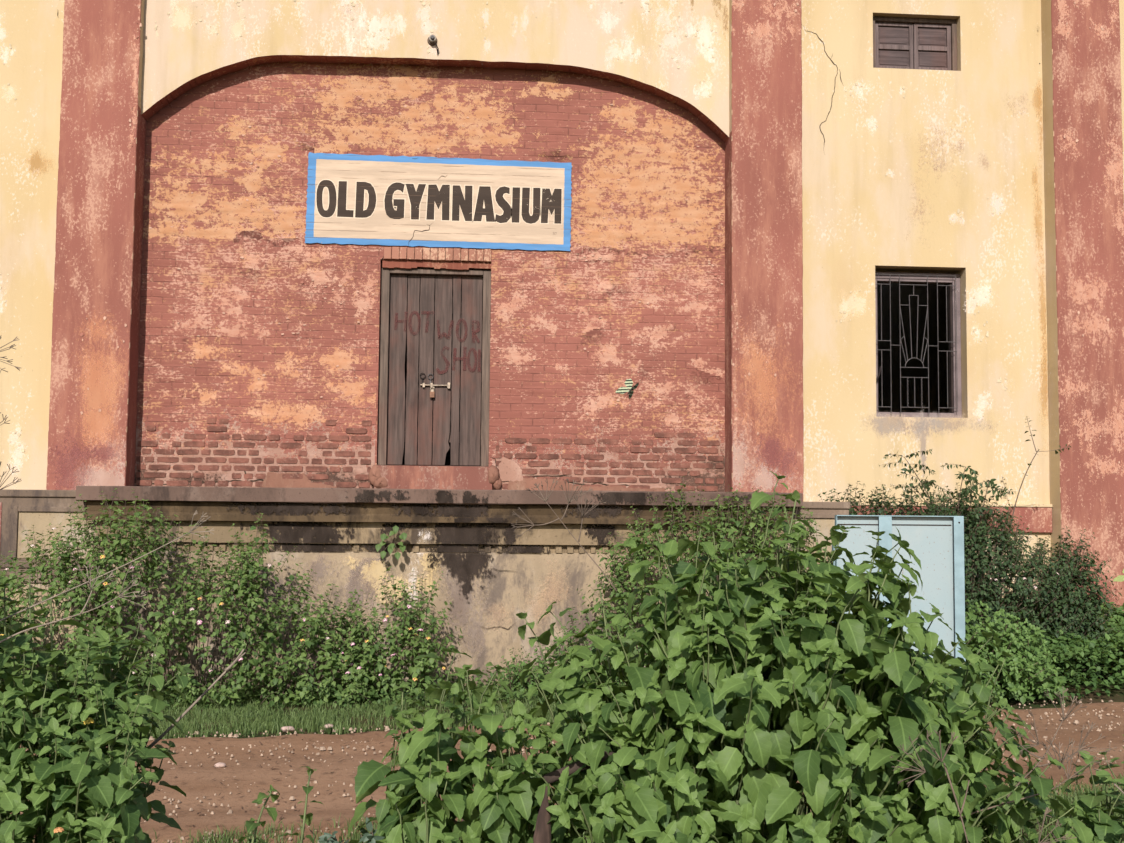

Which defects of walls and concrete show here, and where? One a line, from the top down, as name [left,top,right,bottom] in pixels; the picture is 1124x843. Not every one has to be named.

peeling [1053,0,1119,40]
crack [804,28,843,150]
peeling [1056,113,1124,243]
peeling [128,0,801,492]
peeling [1057,269,1124,357]
peeling [79,316,128,449]
peeling [1059,369,1124,485]
damp [213,467,569,661]